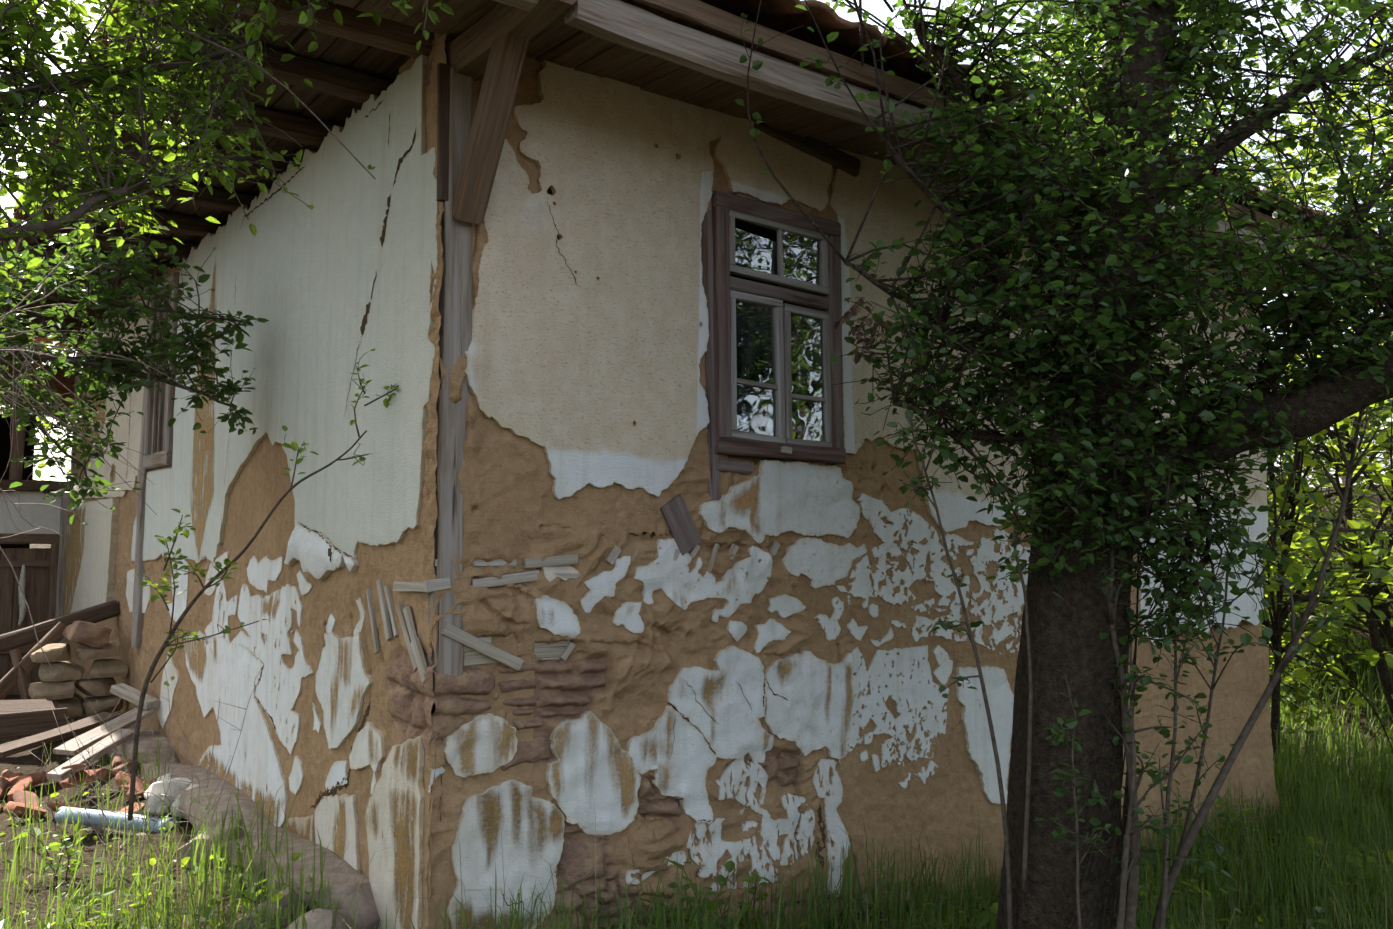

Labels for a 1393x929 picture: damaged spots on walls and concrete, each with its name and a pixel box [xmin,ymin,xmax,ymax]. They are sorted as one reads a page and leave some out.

crack [345,101,416,412]
spalling [399,33,455,180]
spalling [505,65,539,194]
crack [547,201,580,287]
spalling [68,201,1032,929]
spalling [1121,553,1280,858]